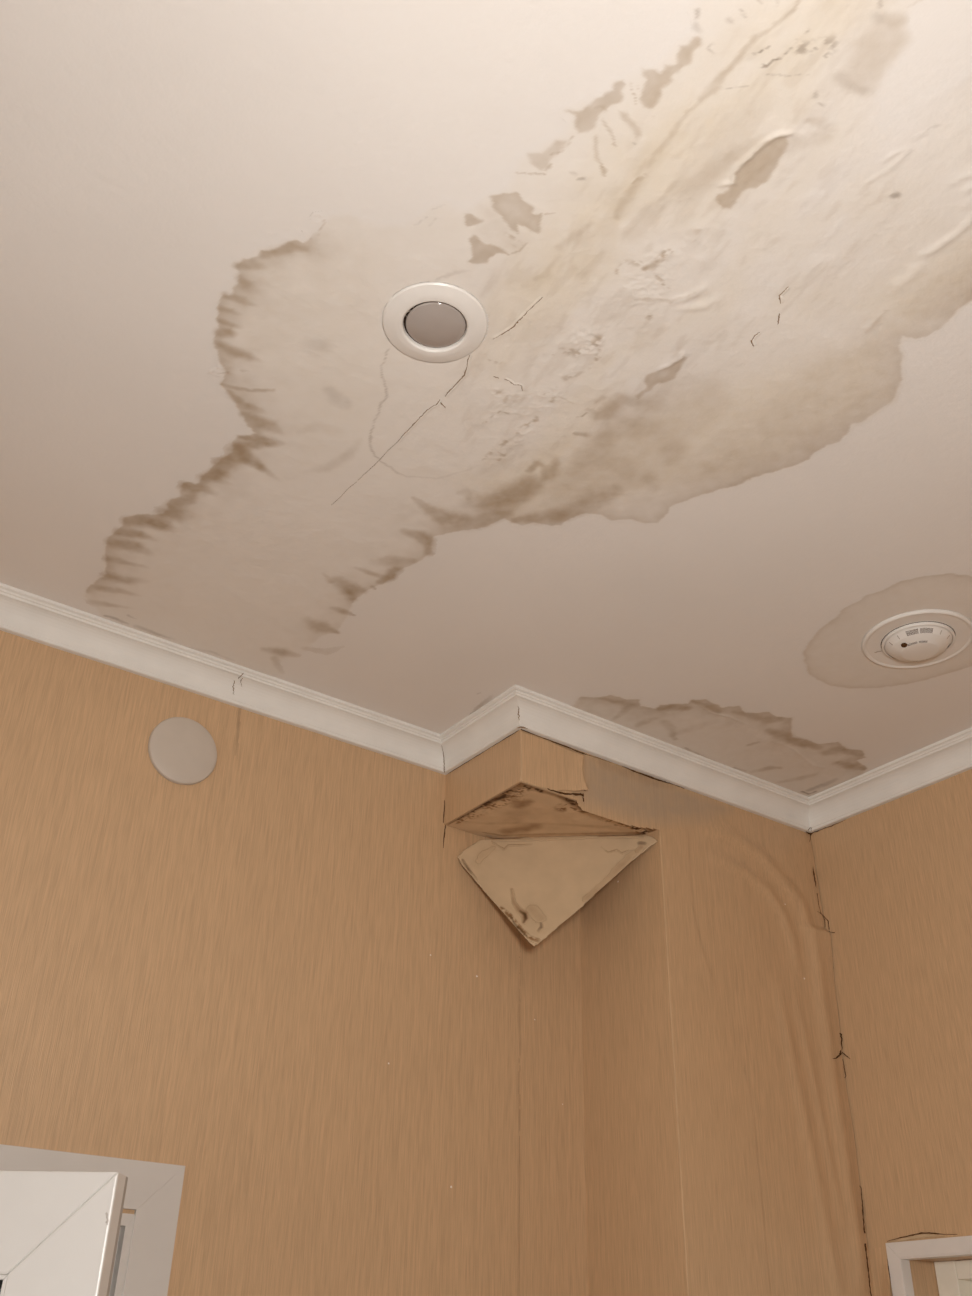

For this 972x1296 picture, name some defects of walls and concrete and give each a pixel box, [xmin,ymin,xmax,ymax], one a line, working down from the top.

crack [335,296,543,502]
water stain [79,0,972,689]
water stain [569,693,871,797]